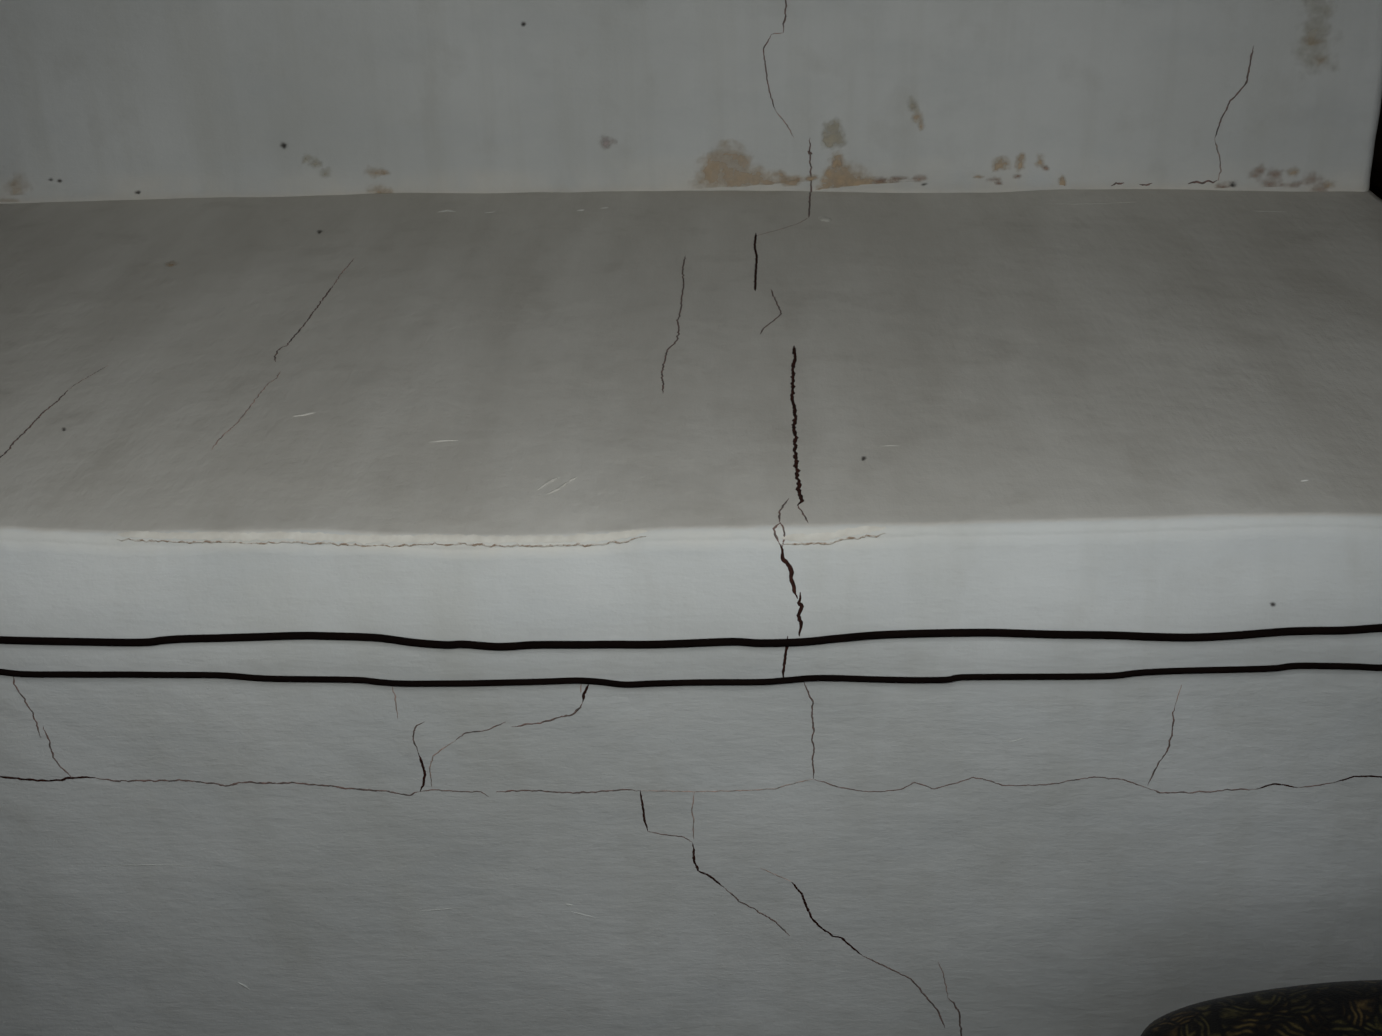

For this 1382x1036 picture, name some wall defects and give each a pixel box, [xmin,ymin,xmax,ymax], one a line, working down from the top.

crack [661,257,686,392]
crack [753,0,812,334]
crack [1188,46,1254,184]
crack [0,346,1382,1036]